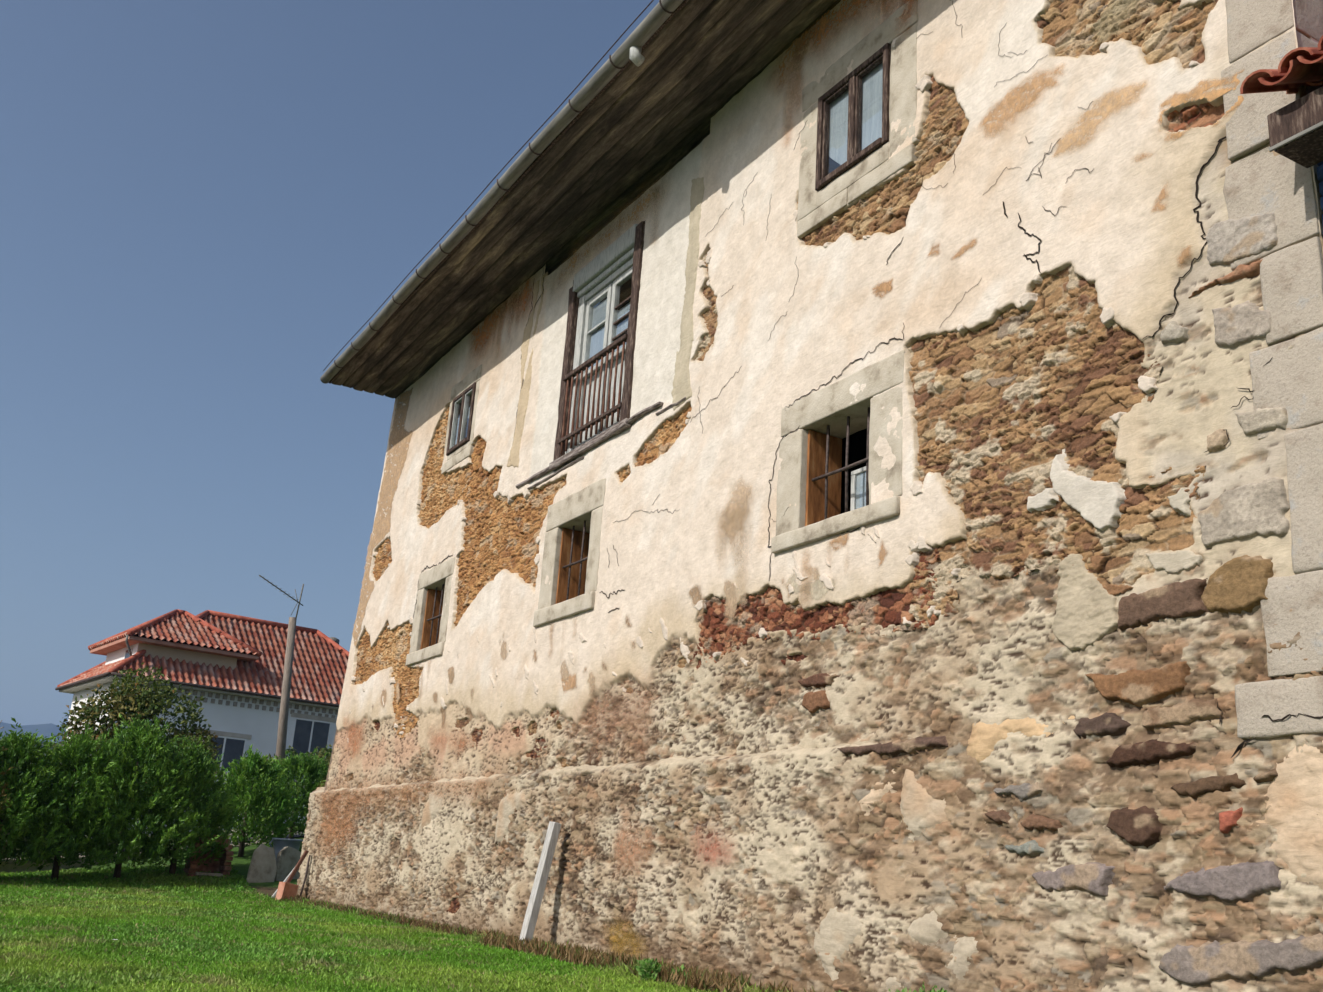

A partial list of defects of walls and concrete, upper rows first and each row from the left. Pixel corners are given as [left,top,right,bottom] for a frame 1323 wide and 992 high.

crack [705,176,771,238]
crack [915,132,956,189]
crack [994,22,1047,87]
spalling [801,0,1244,248]
crack [983,139,1093,273]
crack [1143,136,1226,339]
flaking render [1188,213,1278,298]
spalling [351,388,483,747]
spalling [417,405,567,626]
crack [768,323,904,579]
spalling [617,247,1290,670]
flaking render [798,673,840,714]